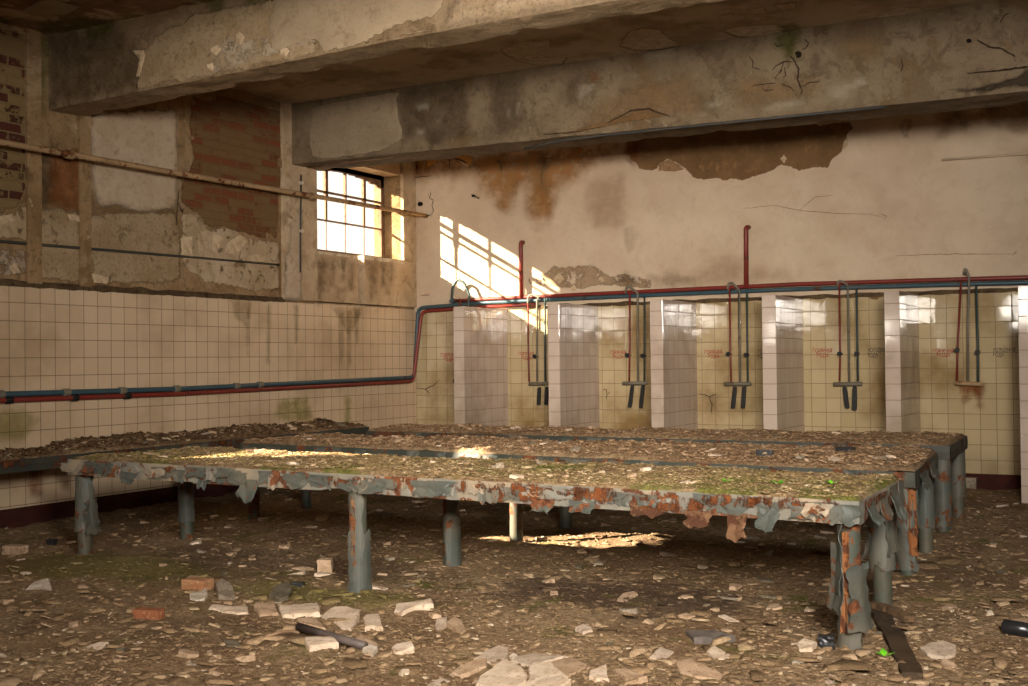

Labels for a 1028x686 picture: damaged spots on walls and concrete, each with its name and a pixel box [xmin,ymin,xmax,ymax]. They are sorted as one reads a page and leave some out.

peeling [133,0,443,89]
crack [724,32,819,95]
crack [967,13,1015,57]
flaking render [0,29,26,276]
flaking render [42,93,302,300]
water stain [416,144,618,215]
flaking render [626,122,853,180]